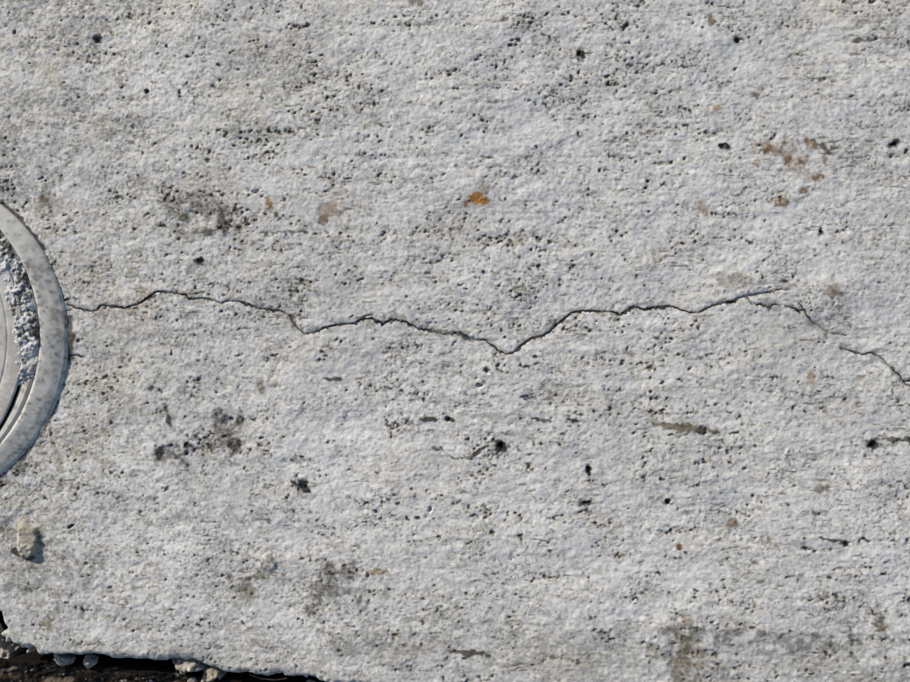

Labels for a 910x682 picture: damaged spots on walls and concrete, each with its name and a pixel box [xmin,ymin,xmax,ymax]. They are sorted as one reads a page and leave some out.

crack [71,289,910,386]